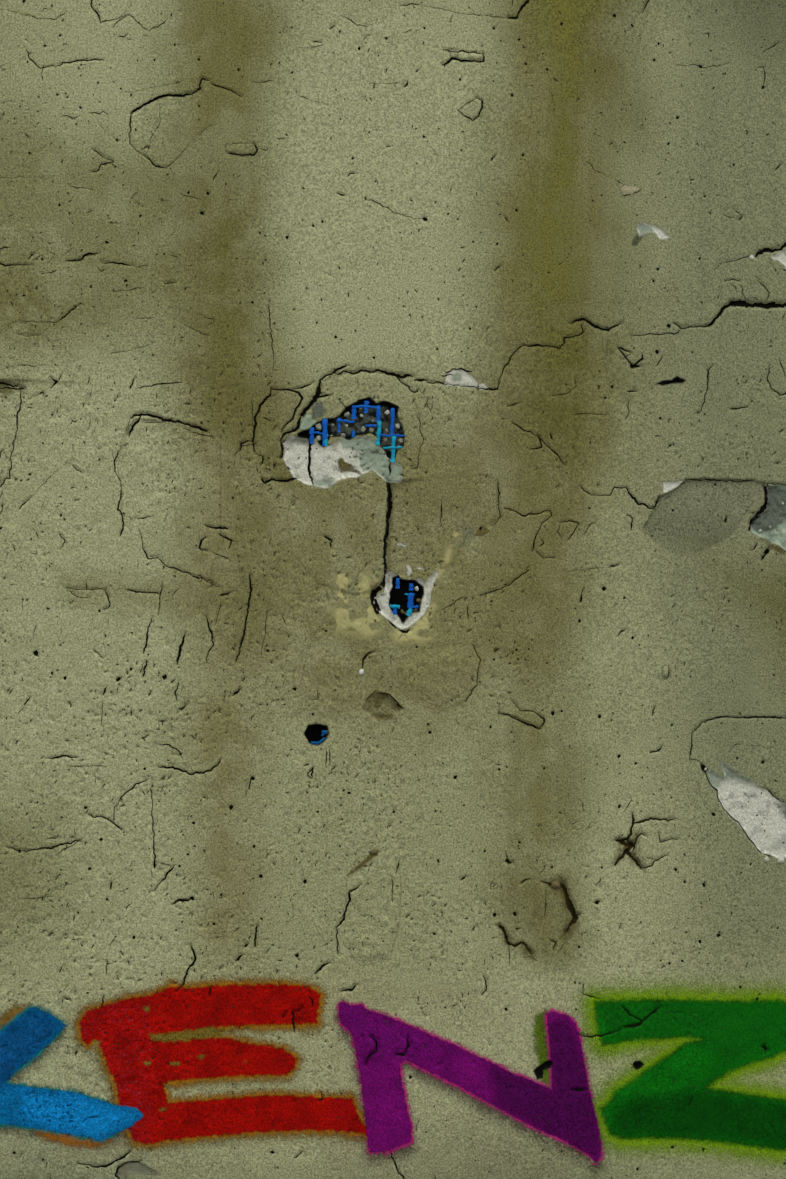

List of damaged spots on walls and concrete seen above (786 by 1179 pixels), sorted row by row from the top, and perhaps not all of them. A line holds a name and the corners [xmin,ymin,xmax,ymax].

crack [3,0,168,71]
crack [371,49,485,87]
crack [399,0,529,19]
crack [61,78,273,200]
crack [0,242,178,292]
spalling [771,250,786,268]
peeling [283,397,500,630]
crack [66,242,786,710]
peeling [644,478,786,553]
crack [499,699,545,729]
spalling [708,757,786,859]
crack [482,716,786,995]